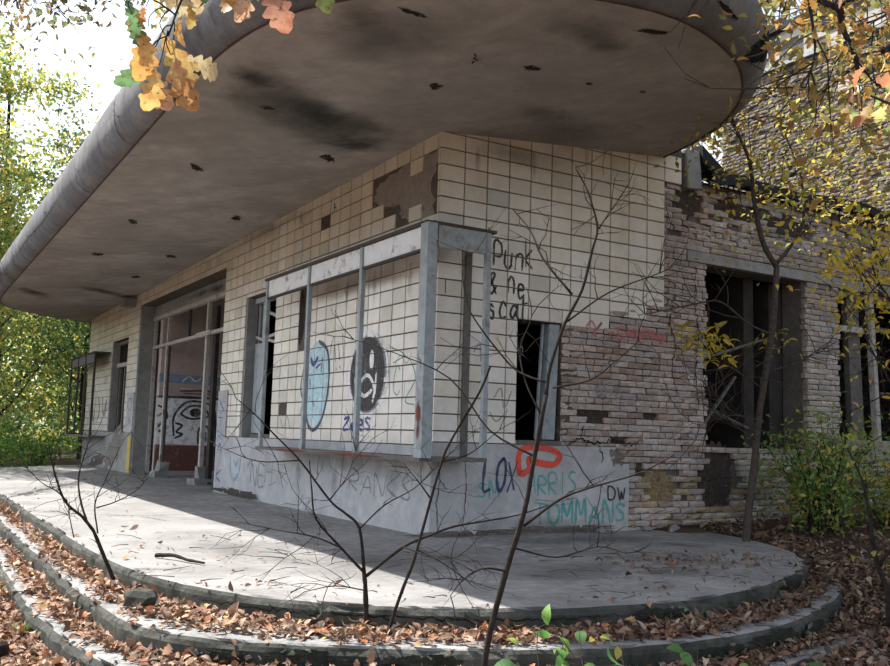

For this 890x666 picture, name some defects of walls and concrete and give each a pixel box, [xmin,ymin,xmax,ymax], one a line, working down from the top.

leakage [277,99,363,131]
peeling [374,150,438,221]
spalling [576,404,609,430]
spalling [597,436,677,507]